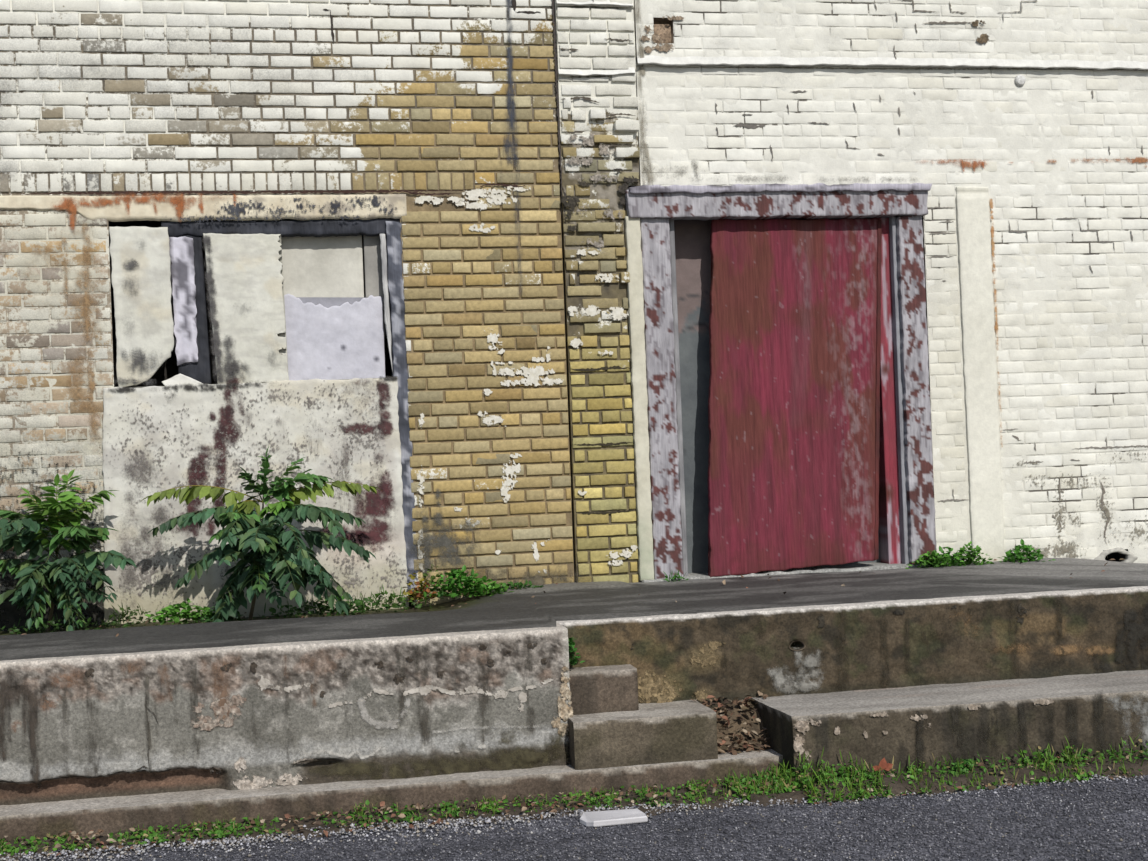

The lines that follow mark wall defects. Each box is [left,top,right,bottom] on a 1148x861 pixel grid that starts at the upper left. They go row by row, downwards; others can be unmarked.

crack [323,9,334,43]
water stain [505,0,517,163]
crack [511,0,1144,214]
crack [3,183,526,196]
rust [939,159,986,172]
rust [54,193,203,340]
rust [69,357,100,435]
peeling [356,96,640,600]
water stain [1010,449,1148,558]
spalling [191,694,247,731]
flaking render [250,662,573,737]
water stain [301,649,569,780]